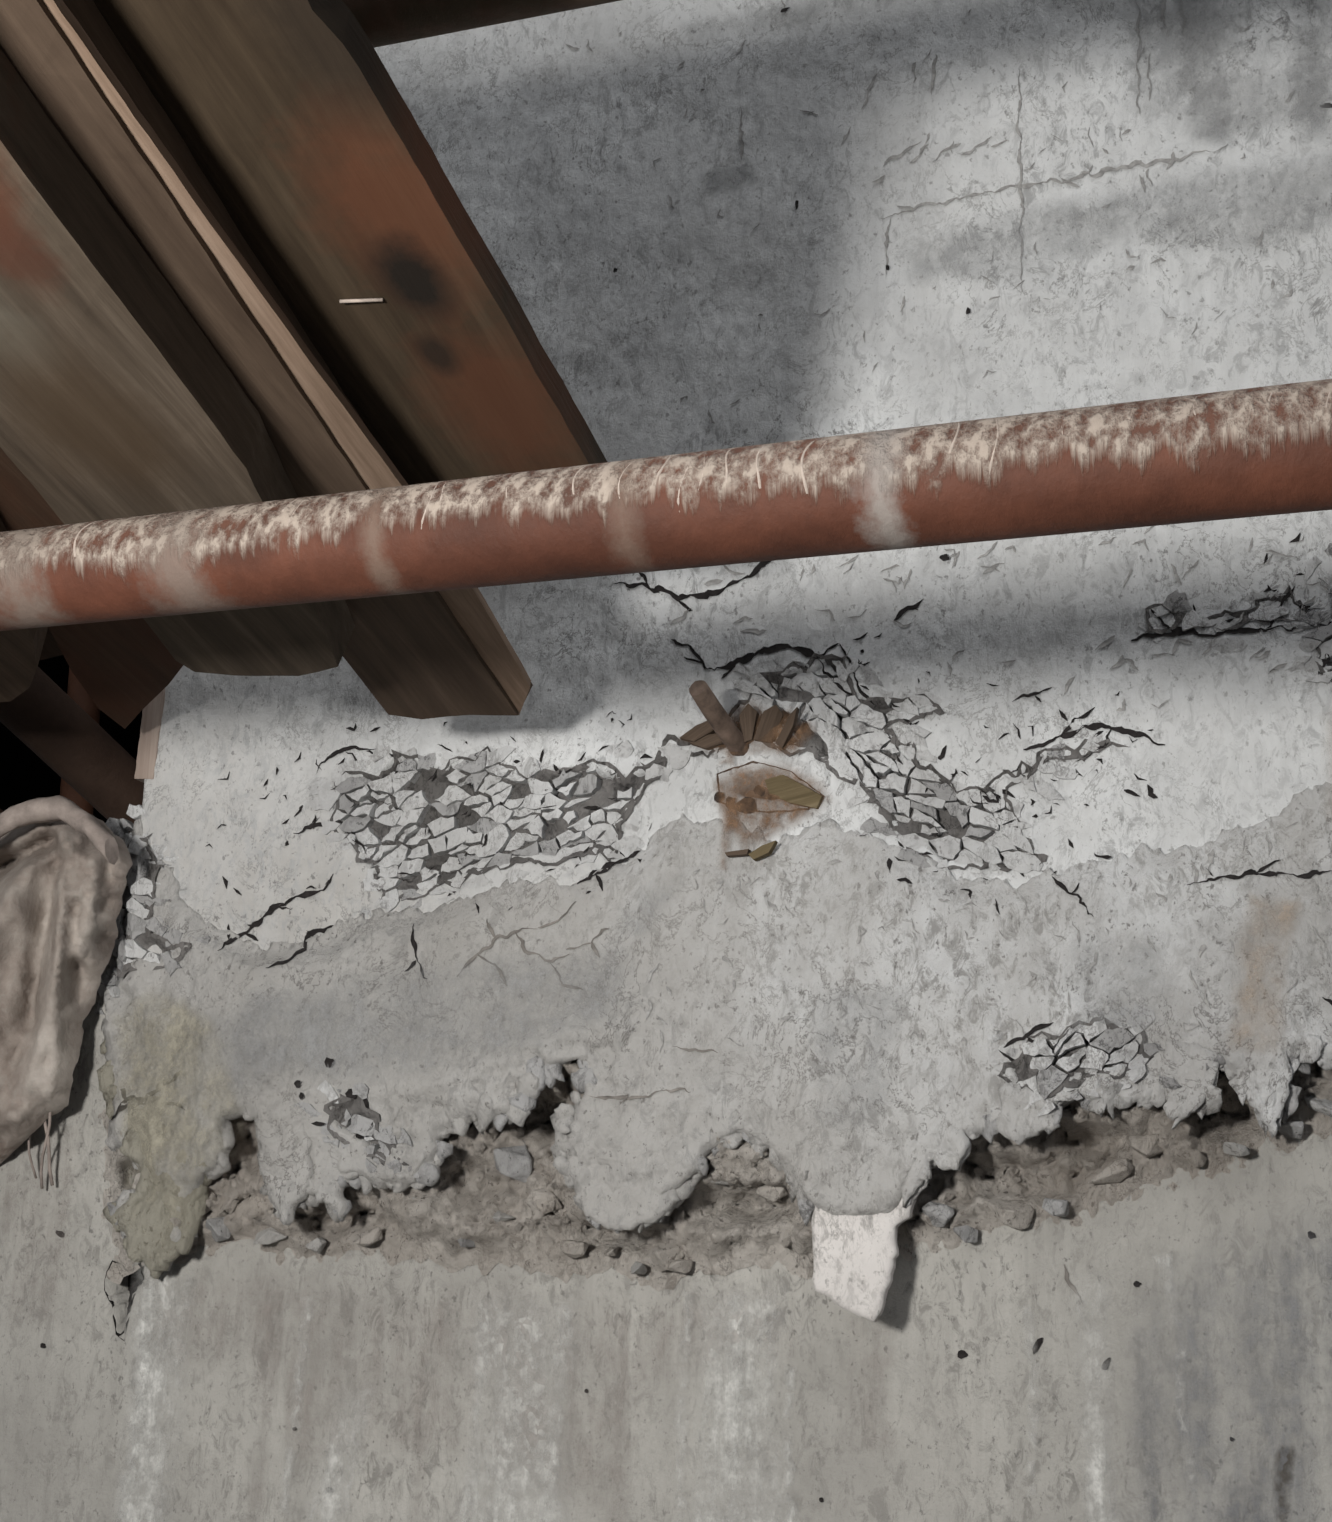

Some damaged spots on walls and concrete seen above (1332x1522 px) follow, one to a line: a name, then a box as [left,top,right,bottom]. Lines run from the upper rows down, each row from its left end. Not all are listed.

crack [566,31,627,72]
crack [1285,90,1332,108]
crack [1271,279,1293,298]
spalling [94,804,211,1015]
crack [205,711,652,990]
corrosion [718,769,810,838]
crack [614,526,1332,1062]
spalling [98,1109,144,1341]
spalling [170,1060,814,1291]
crack [591,1087,689,1105]
spalling [897,1003,1332,1261]
damp [1087,1407,1105,1522]